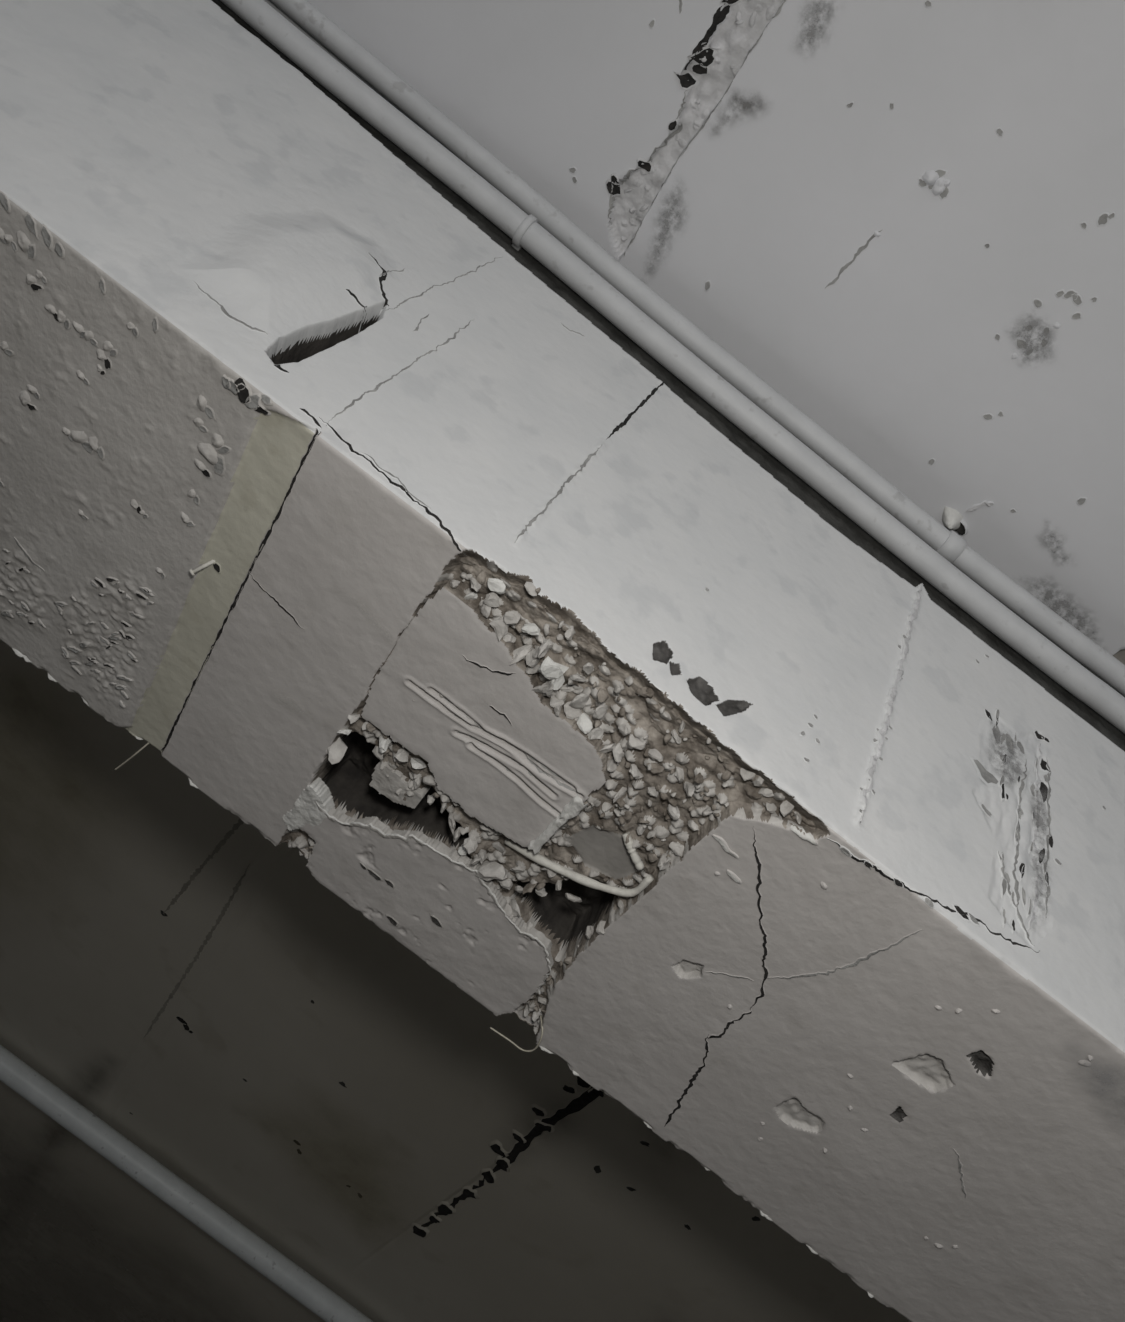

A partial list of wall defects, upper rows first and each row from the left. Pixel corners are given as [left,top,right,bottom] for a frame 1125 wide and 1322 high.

peeling [674,43,740,109]
peeling [605,173,643,227]
peeling [637,158,653,174]
crack [194,281,289,373]
flaking render [269,315,380,365]
crack [346,252,502,333]
crack [514,382,664,543]
crack [161,318,475,754]
spalling [310,550,830,1054]
spalling [276,829,316,859]
crack [664,826,1040,1127]
flaking render [966,1050,995,1077]